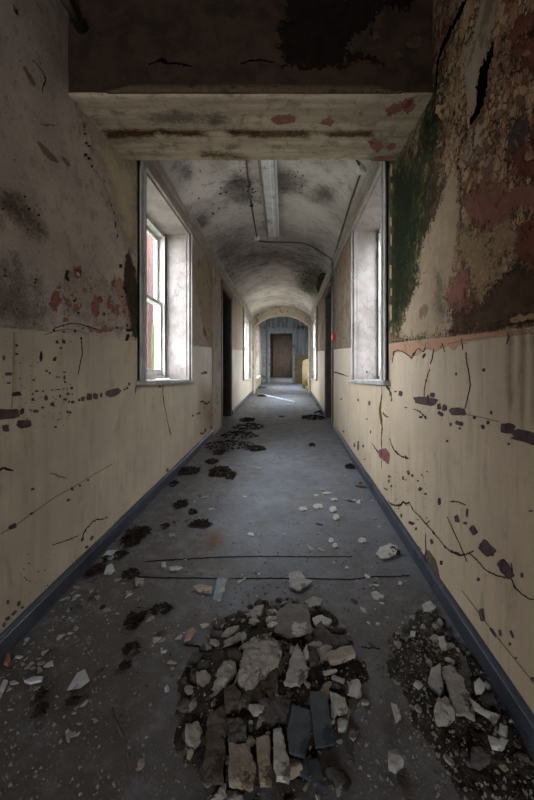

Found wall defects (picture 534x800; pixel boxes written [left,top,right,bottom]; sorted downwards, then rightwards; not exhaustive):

crack [470,39,494,125]
peeling [271,114,297,125]
flaking render [48,123,138,341]
water stain [389,73,460,342]
flaking render [367,0,534,364]
water stain [292,268,325,299]
crack [45,323,100,374]
crack [414,369,430,419]
crack [461,338,471,408]
crack [52,516,107,549]
crack [138,556,410,580]
crack [388,501,534,600]